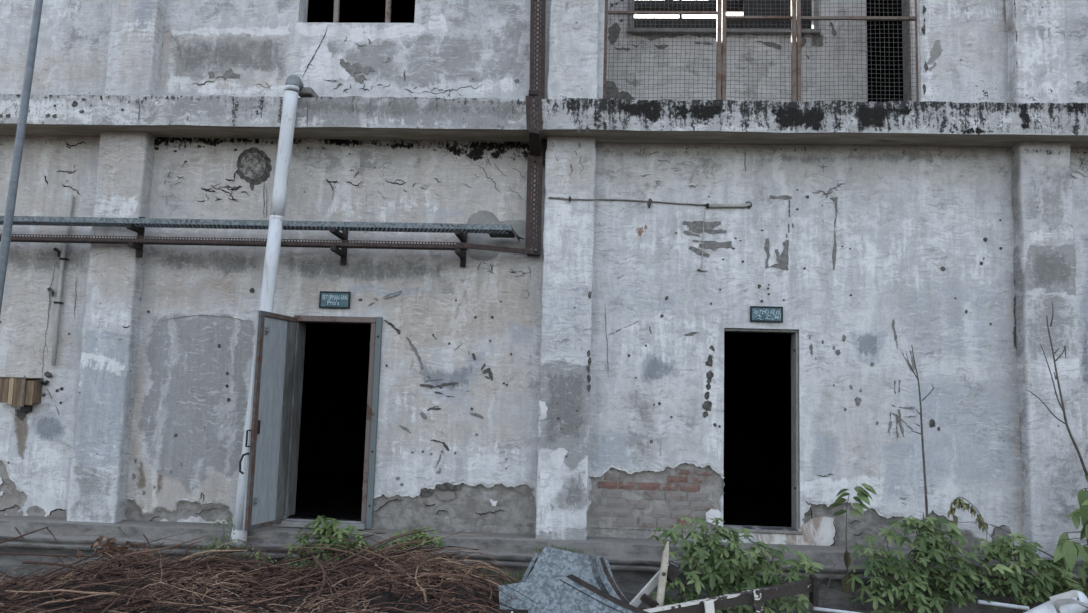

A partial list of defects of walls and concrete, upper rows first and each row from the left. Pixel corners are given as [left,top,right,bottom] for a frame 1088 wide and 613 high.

crack [301,26,328,124]
leakage [582,100,662,123]
mould [772,106,824,130]
mould [857,105,912,127]
leakage [1019,104,1030,132]
mould [447,141,529,161]
spalling [675,221,742,260]
peeling [761,183,851,270]
flaking render [0,458,66,517]
flaking render [373,439,536,534]
flaking render [586,461,725,541]
flaking render [756,500,1012,551]